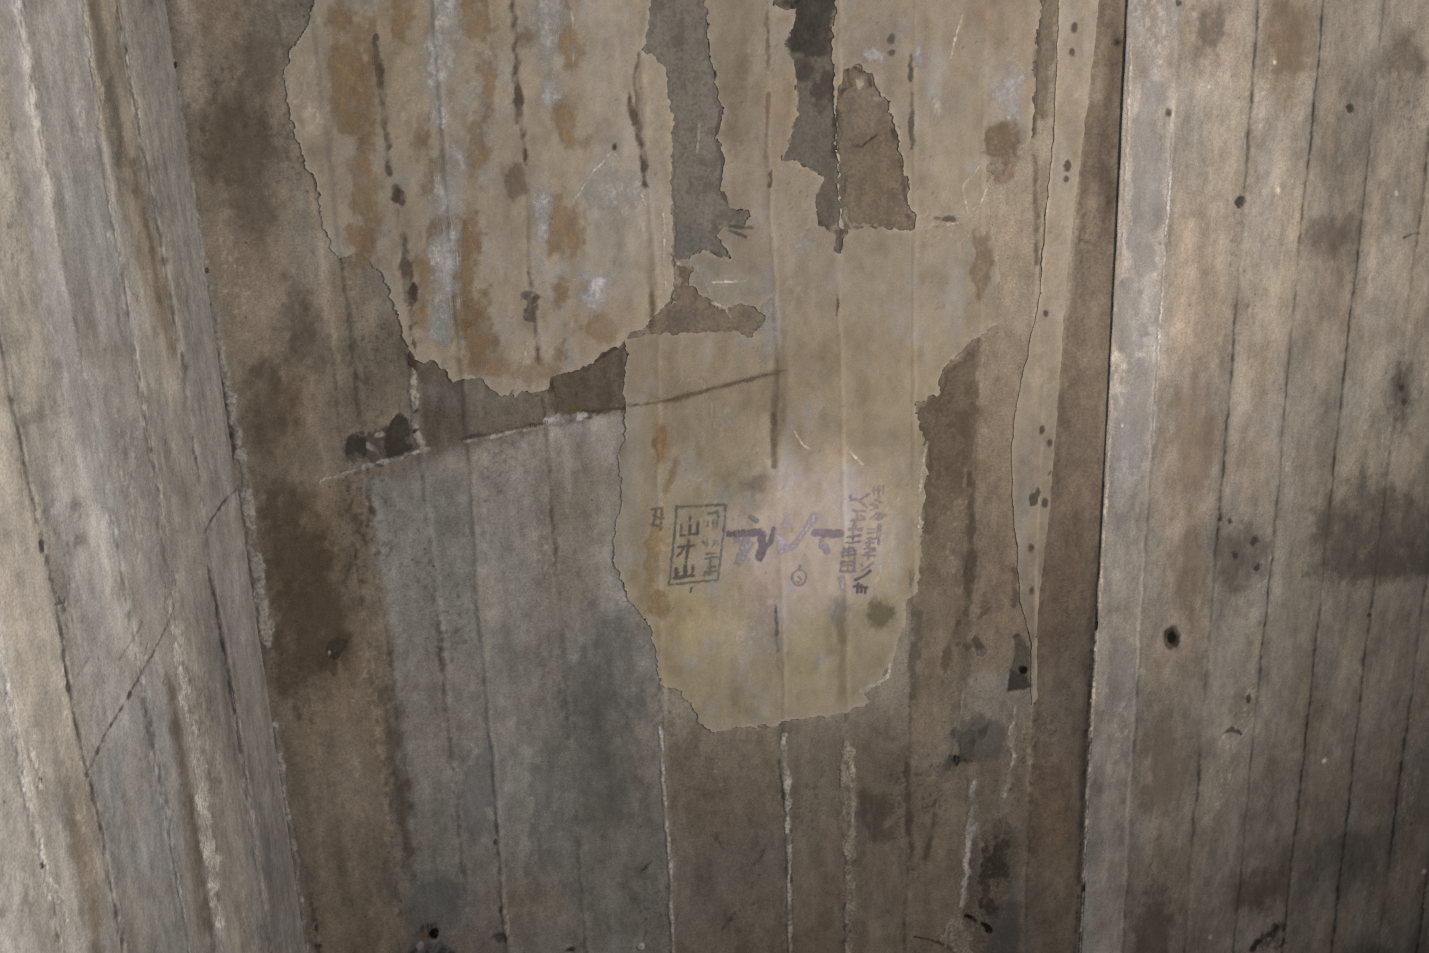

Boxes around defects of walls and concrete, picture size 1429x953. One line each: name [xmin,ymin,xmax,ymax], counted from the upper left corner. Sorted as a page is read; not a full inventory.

peeling [643,0,765,338]
peeling [772,0,912,254]
crack [210,447,430,529]
peeling [549,343,626,421]
crack [464,375,767,443]
peeling [917,352,978,533]
spalling [1029,488,1048,507]
crack [39,540,175,777]
crack [208,567,245,772]